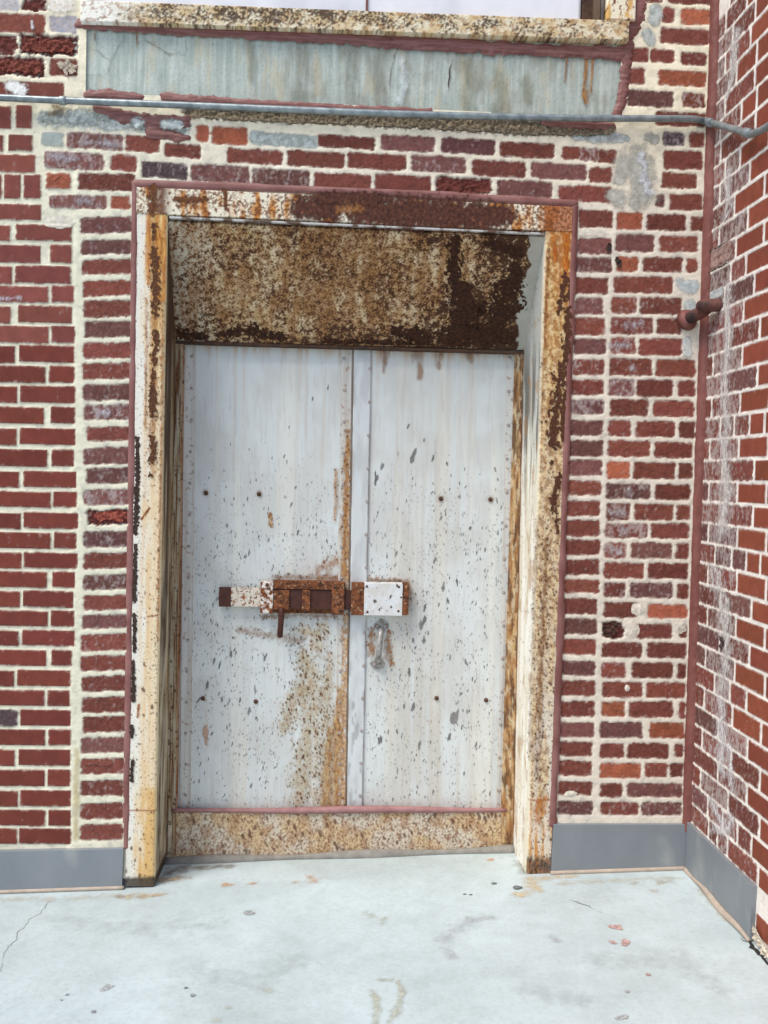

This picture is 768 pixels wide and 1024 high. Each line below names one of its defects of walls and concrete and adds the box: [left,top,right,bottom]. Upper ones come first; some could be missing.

corrosion [582,58,594,104]
efflorescence [724,29,740,101]
corrosion [290,189,528,365]
corrosion [543,233,569,322]
efflorescence [637,151,655,196]
efflorescence [721,168,732,227]
corrosion [140,183,287,630]
efflorescence [718,282,733,542]
corrosion [264,613,344,807]
corrosion [527,518,550,779]
efflorescence [710,563,734,792]
efflorescence [708,797,739,835]